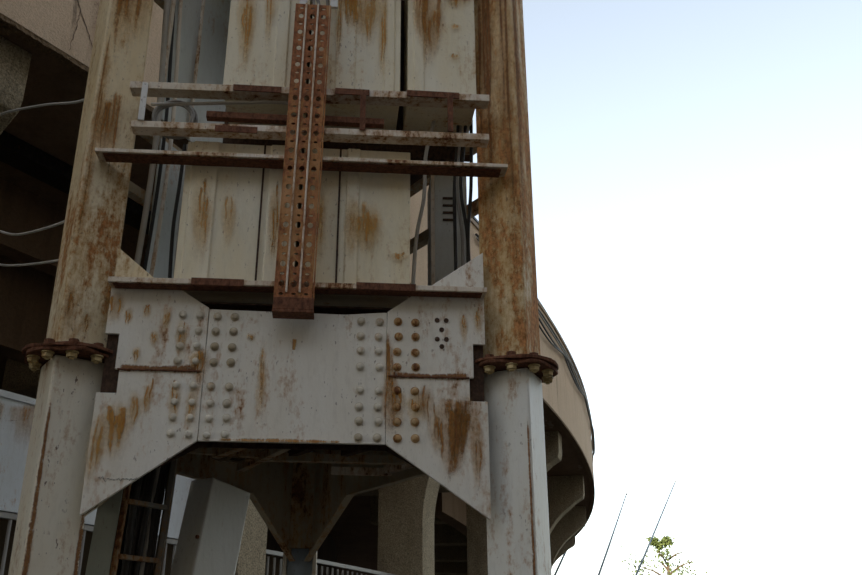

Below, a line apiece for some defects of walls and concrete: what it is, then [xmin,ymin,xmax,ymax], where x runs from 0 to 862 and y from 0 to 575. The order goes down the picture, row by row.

crack [70,0,93,49]
corrosion [337,0,386,60]
corrosion [90,42,121,153]
corrosion [89,350,204,466]
corrosion [385,337,482,471]
corrosion [22,406,51,575]
corrosion [73,514,85,575]